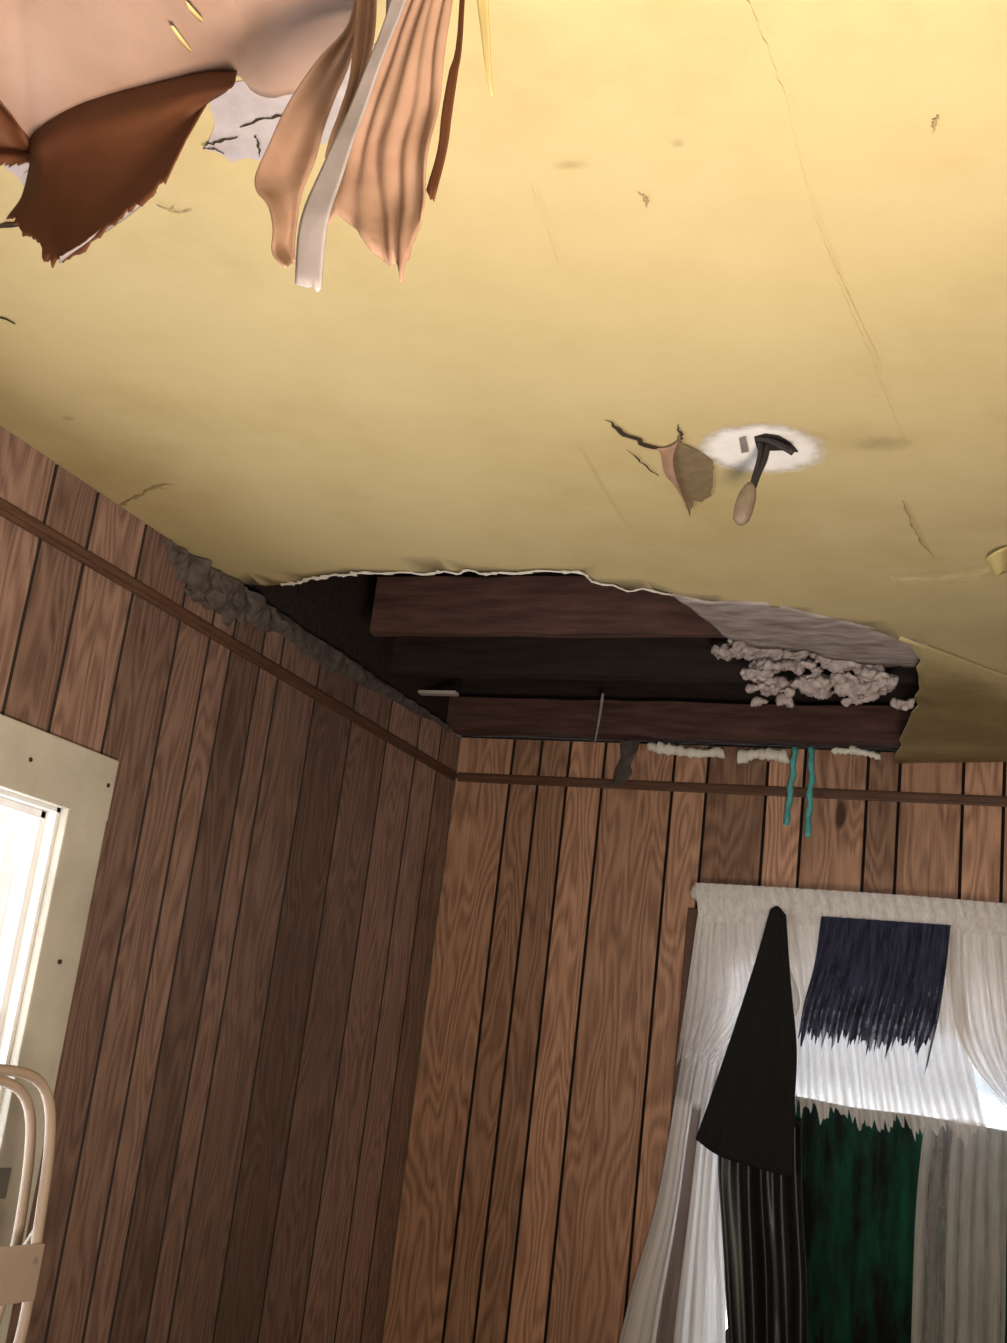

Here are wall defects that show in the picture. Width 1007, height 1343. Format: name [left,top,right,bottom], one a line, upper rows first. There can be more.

crack [0,221,19,229]
peeling [0,0,493,293]
spalling [160,538,451,733]